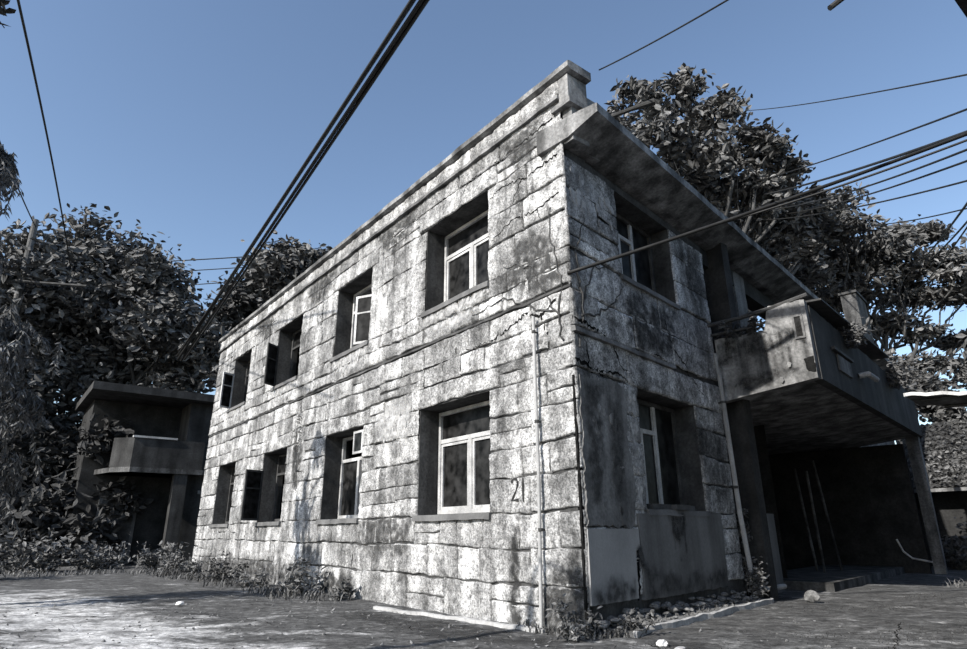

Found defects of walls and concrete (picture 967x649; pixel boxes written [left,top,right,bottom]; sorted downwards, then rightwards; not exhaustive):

crack [465,298,637,383]
crack [651,325,706,400]